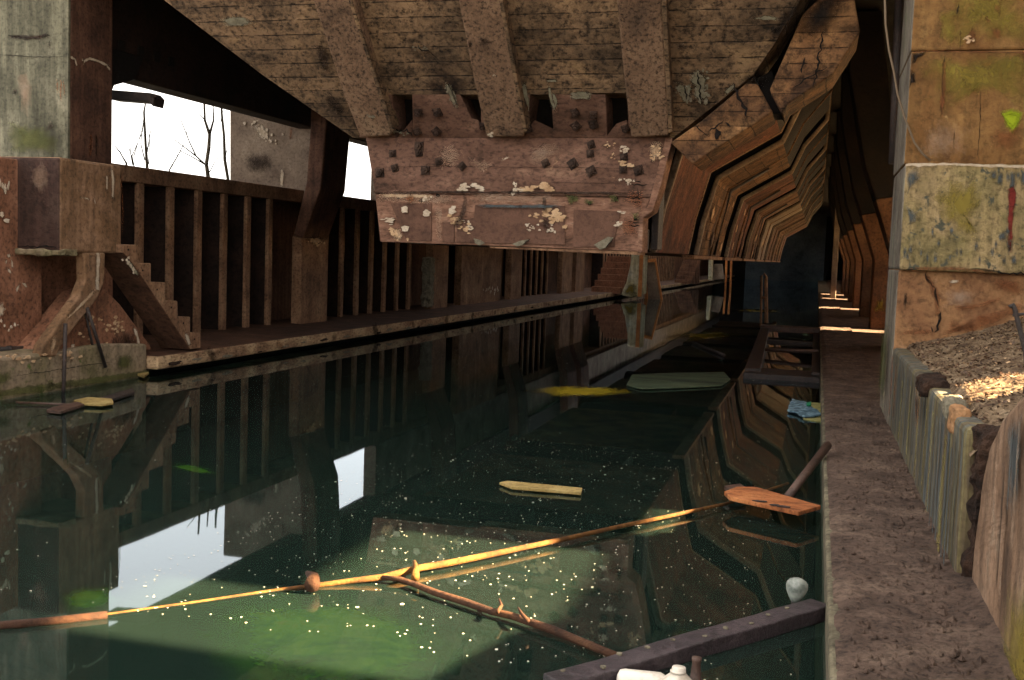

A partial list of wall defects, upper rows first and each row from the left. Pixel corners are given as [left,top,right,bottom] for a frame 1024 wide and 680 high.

crack [793,32,827,88]
peeling [604,141,635,185]
peeling [649,143,665,160]
peeling [457,183,485,191]
peeling [511,182,555,196]
peeling [380,194,432,241]
peeling [447,206,485,246]
peeling [513,208,568,246]
corrosion [1008,187,1016,250]
crack [925,272,942,332]